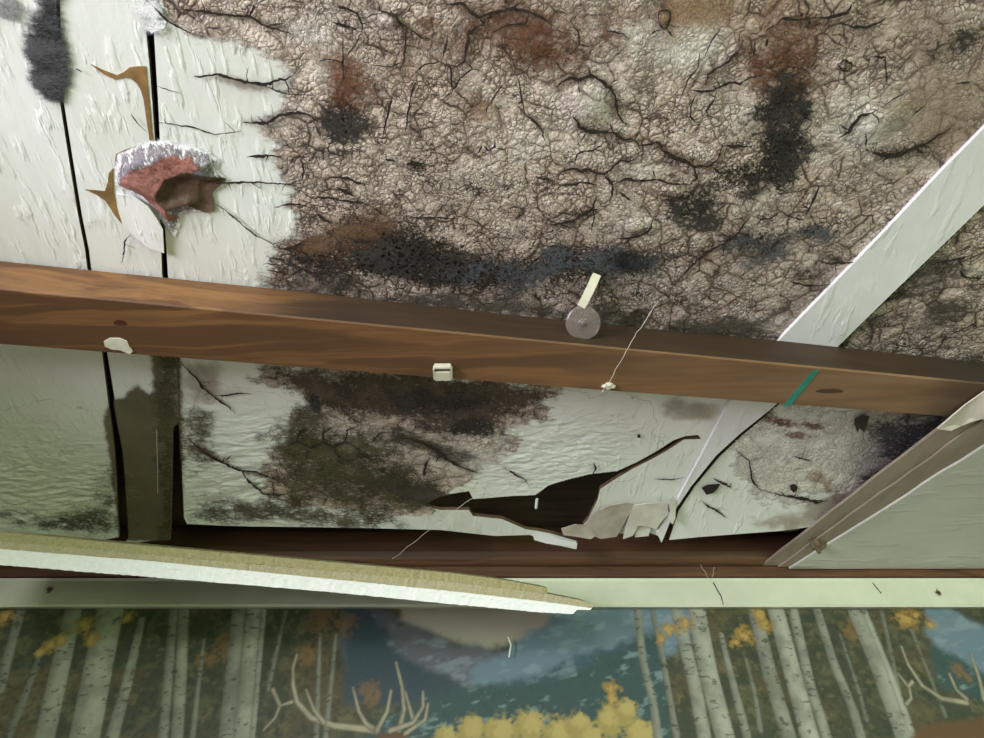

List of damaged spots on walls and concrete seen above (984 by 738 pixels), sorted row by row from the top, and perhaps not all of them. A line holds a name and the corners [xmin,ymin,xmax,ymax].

leakage [0,0,73,103]
crack [155,0,290,35]
crack [131,69,317,135]
crack [319,1,751,232]
crack [679,2,886,123]
crack [837,56,951,161]
crack [213,154,456,279]
leakage [156,0,984,363]
leakage [192,364,563,529]
peeling [561,496,676,539]
crack [714,451,827,504]
leakage [727,404,950,507]